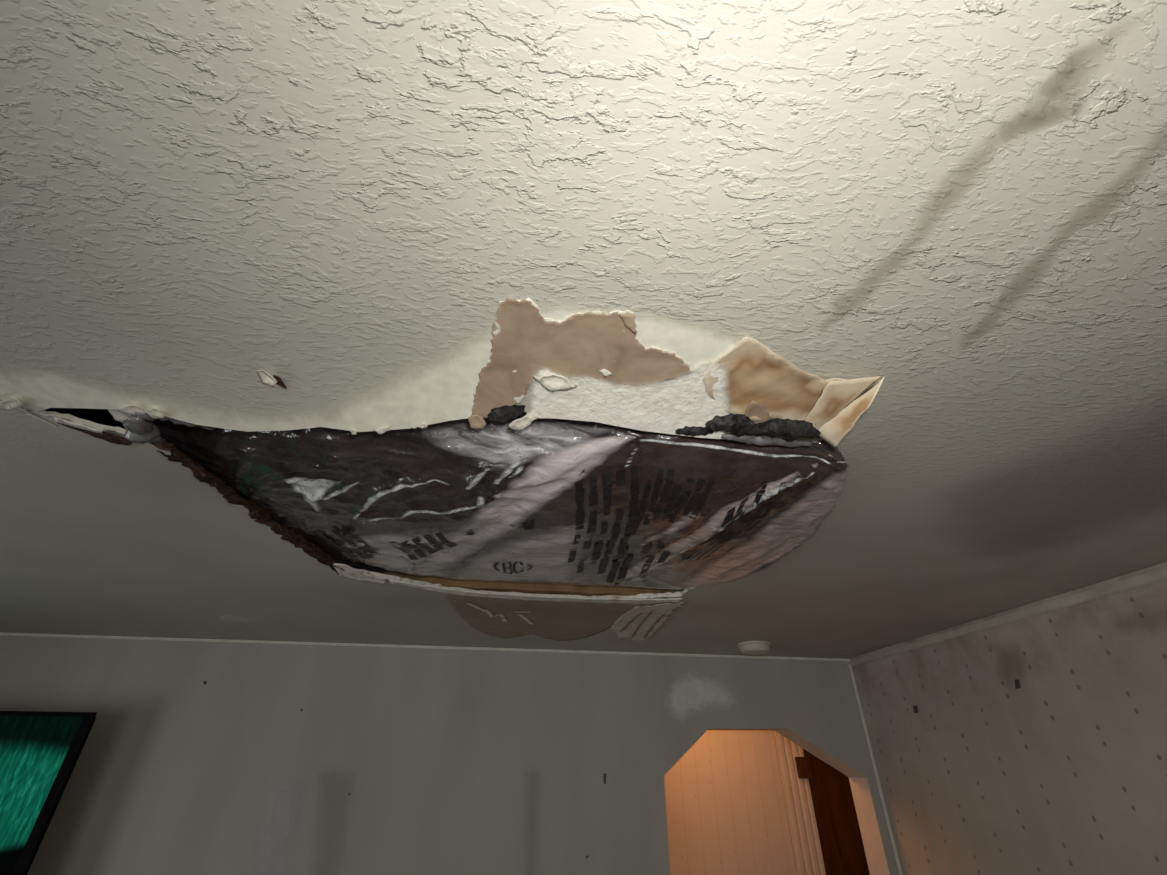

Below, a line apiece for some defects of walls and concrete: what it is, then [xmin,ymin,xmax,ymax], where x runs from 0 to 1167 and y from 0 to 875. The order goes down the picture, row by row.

peeling [541,308,610,321]
peeling [635,317,740,371]
peeling [0,331,494,435]
flaking render [534,374,577,391]
flaking render [509,415,537,431]
spalling [333,563,697,599]